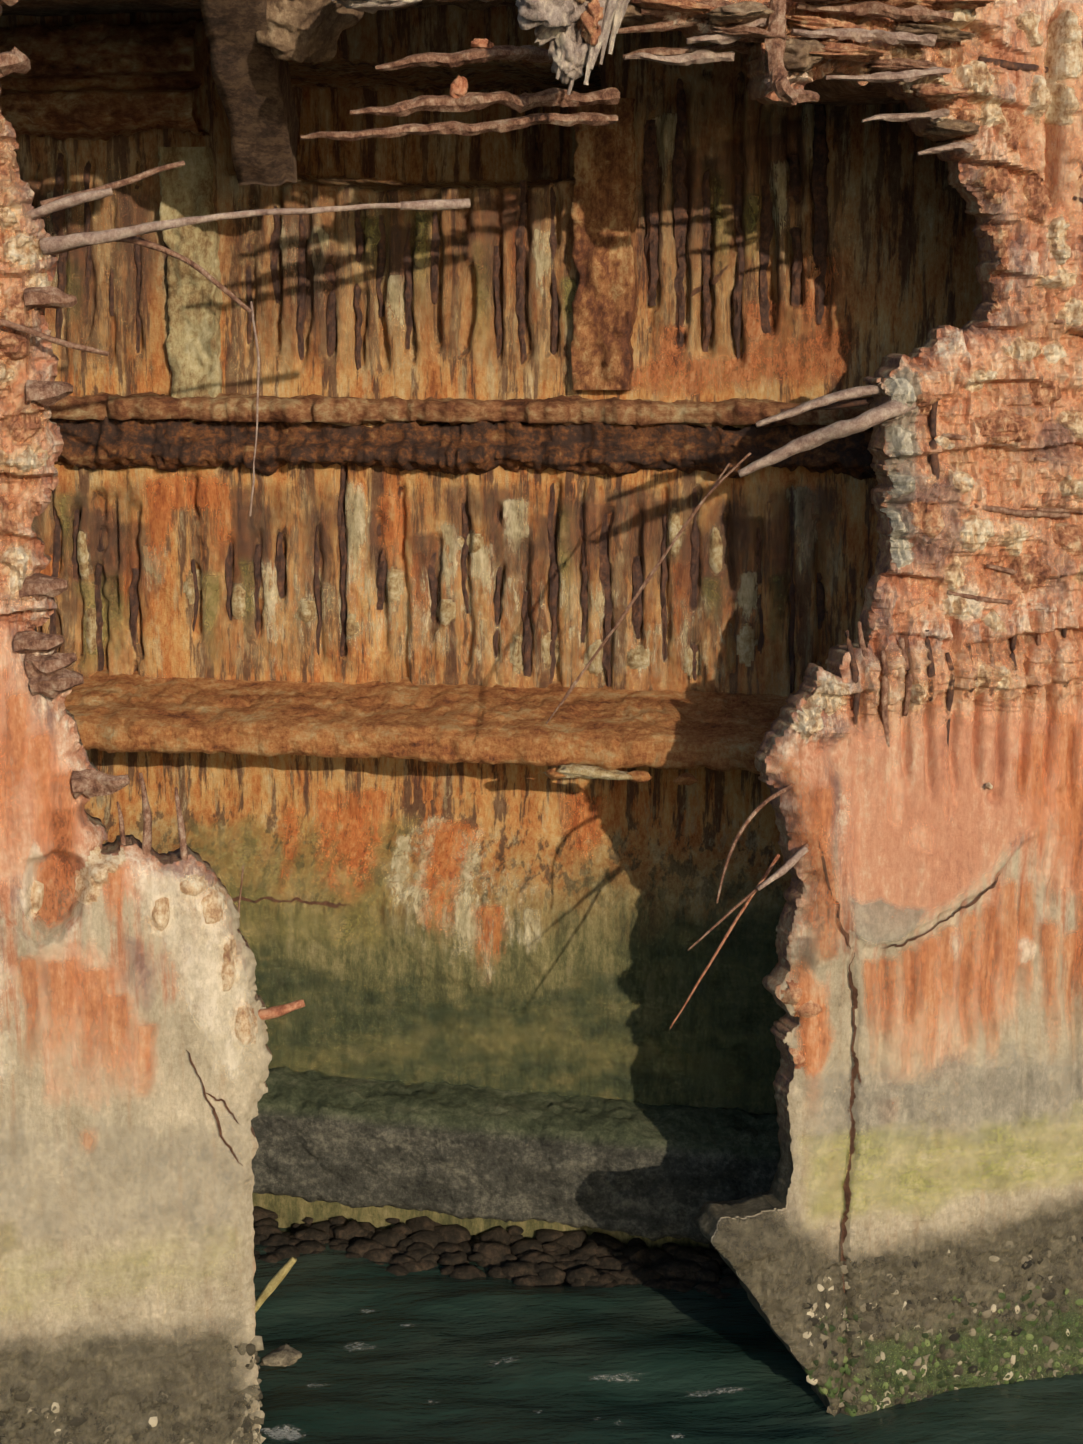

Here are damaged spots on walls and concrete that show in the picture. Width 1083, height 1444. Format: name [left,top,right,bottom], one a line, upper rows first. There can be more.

spalling [0,0,19,16]
spalling [0,46,31,93]
spalling [0,110,576,645]
corrosion [0,649,73,879]
crack [186,1050,243,1166]
leakage [388,819,541,975]
spalling [294,0,1083,1408]
corrosion [778,760,837,1074]
crack [817,836,1002,1293]
corrosion [864,883,1083,1068]
corrosion [1004,713,1083,892]
leakage [712,1201,1083,1416]